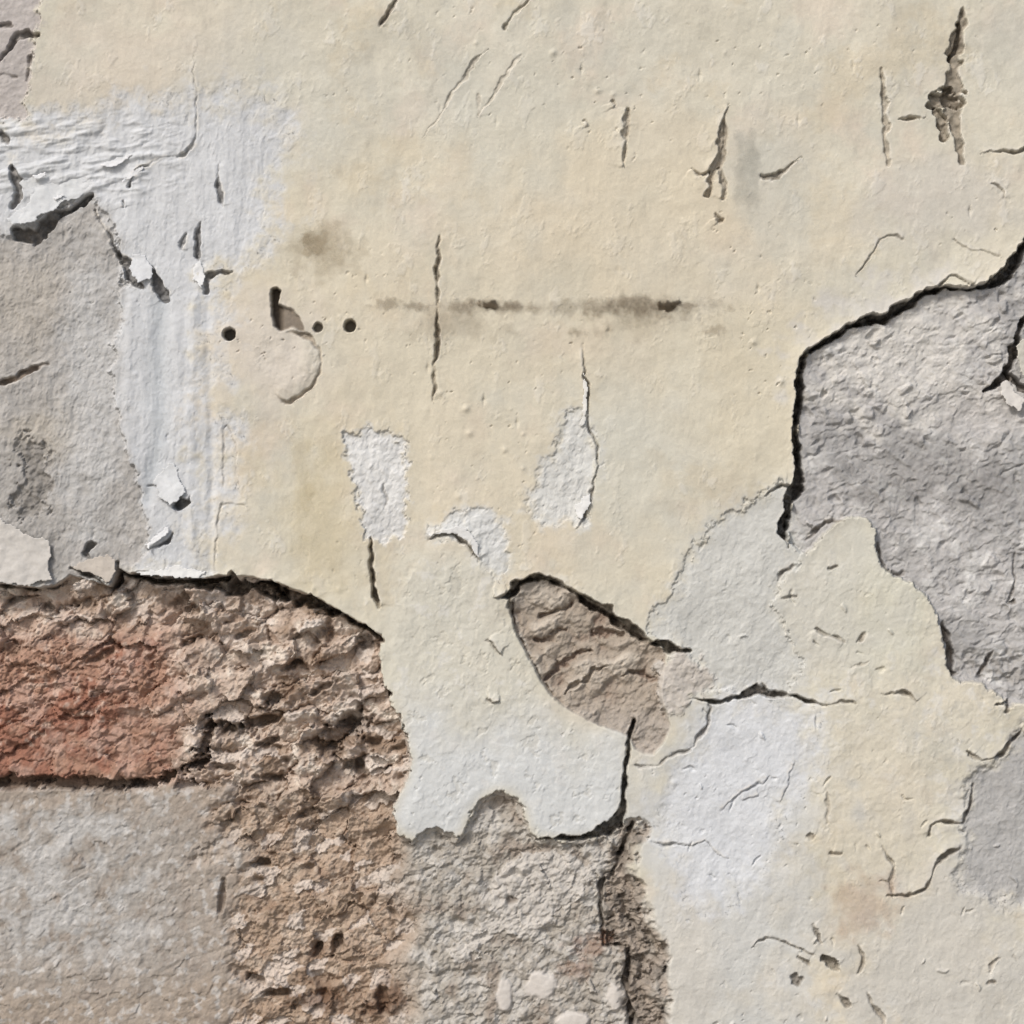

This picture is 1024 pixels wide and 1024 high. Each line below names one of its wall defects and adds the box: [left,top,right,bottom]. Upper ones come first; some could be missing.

spalling [0,0,673,1024]
crack [432,236,442,403]
peeling [514,253,1024,755]
crack [764,234,1024,549]
crack [536,684,858,1024]
peeling [654,695,824,911]
crack [881,690,919,703]
crack [887,699,1023,899]